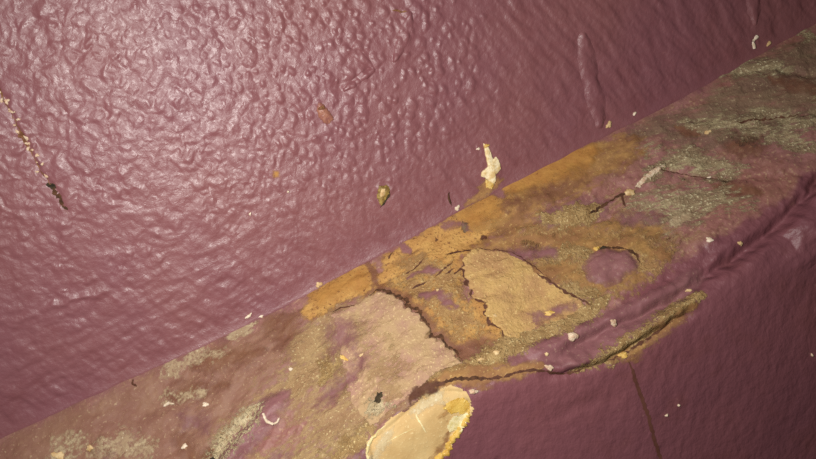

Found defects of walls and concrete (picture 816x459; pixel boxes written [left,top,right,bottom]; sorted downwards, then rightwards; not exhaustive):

crack [0,89,68,214]
peeling [377,185,390,206]
peeling [476,143,504,198]
peeling [461,235,584,340]
crack [537,273,591,306]
peeling [331,285,474,459]
crack [429,322,671,387]